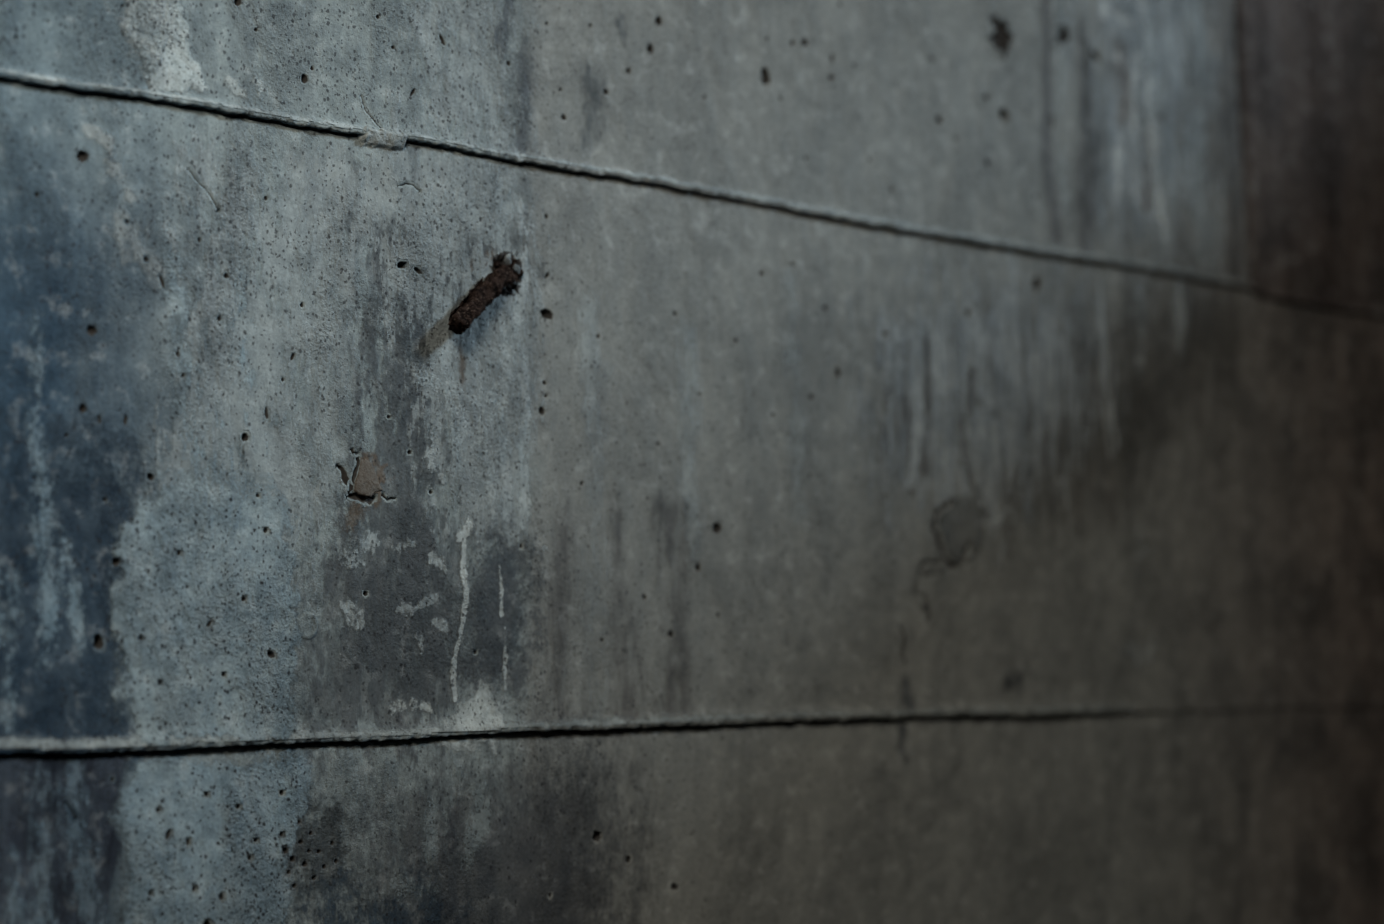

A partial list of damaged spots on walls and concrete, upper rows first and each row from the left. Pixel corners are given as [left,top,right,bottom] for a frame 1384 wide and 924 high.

leakage [0,69,363,129]
corrosion [448,256,524,335]
leakage [387,0,1247,567]
flaking render [336,448,396,506]
leakage [0,124,1135,924]